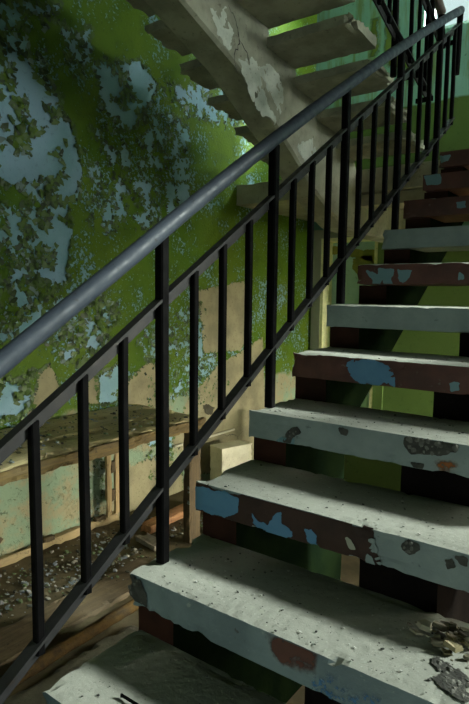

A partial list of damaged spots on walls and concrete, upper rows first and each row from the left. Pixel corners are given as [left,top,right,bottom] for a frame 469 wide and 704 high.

crack [230,10,250,71]
flaking render [238,57,284,125]
peeling [0,0,245,346]
peeling [0,291,121,426]
flaking render [128,325,155,408]
flaking render [169,280,264,429]
peeling [346,359,395,387]
flaking render [129,441,156,512]
flaking render [200,367,265,474]
spalling [403,436,459,469]
peeling [169,472,381,565]
spalling [431,656,469,703]